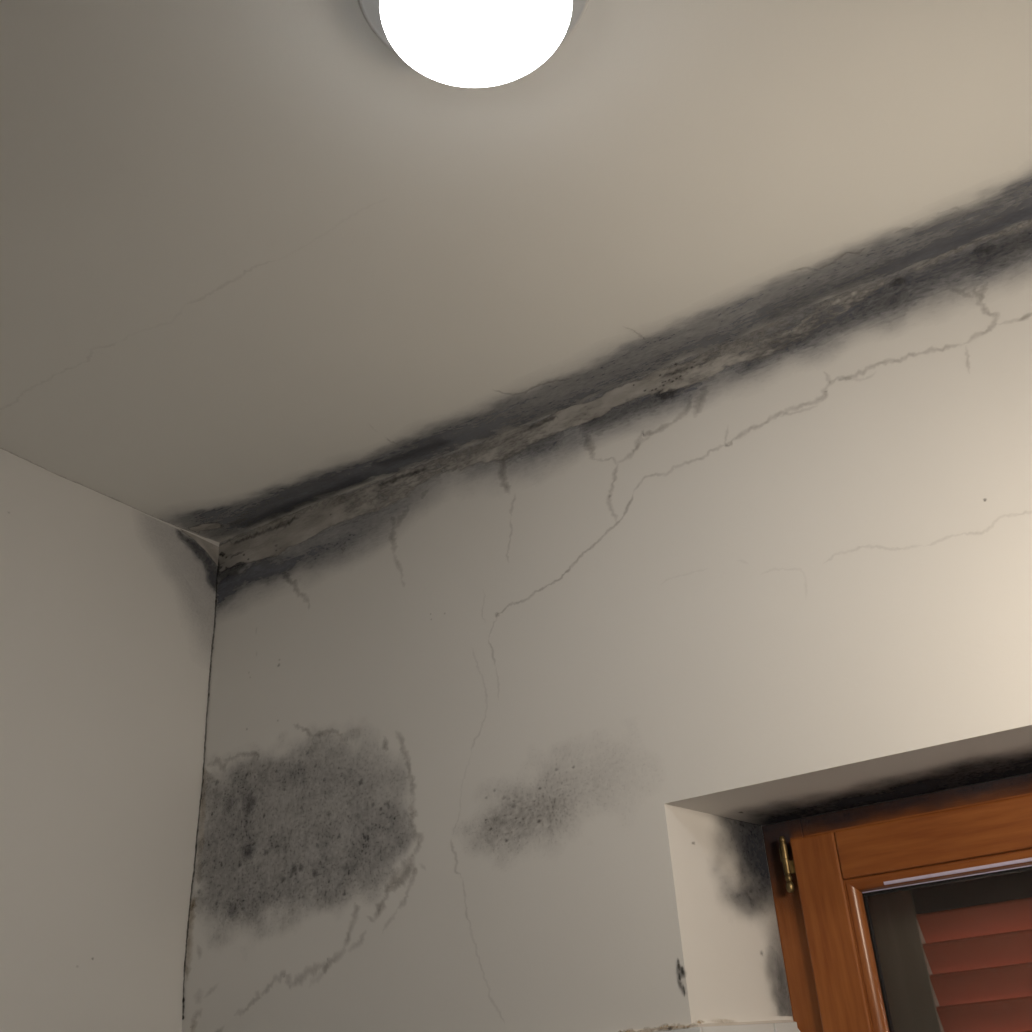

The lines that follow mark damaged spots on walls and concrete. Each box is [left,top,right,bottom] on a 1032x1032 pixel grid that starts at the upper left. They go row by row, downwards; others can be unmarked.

leakage [178,176,1032,608]
leakage [201,751,407,916]
leakage [723,753,1032,909]